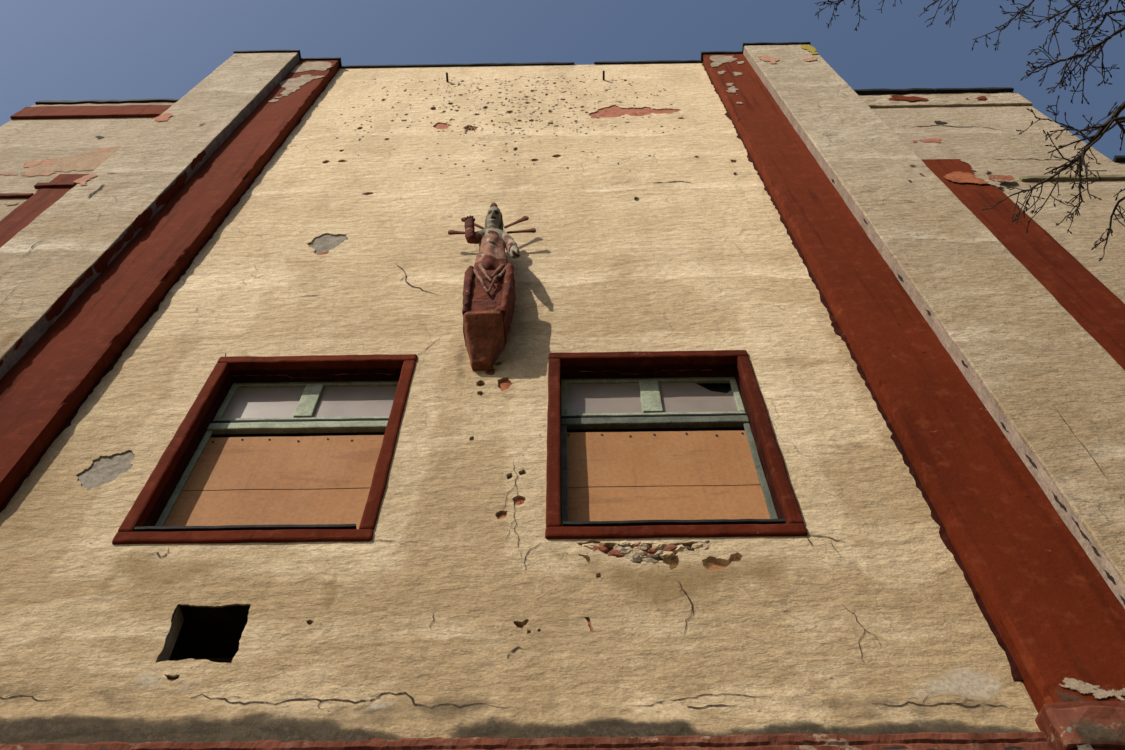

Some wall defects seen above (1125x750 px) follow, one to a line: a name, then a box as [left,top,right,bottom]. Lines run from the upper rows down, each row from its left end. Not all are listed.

peeling [268,61,332,102]
flaking render [340,75,683,176]
flaking render [308,234,348,255]
crack [396,264,435,294]
flaking render [77,451,134,490]
crack [503,460,547,572]
flaking render [582,540,741,570]
crack [676,580,694,633]
crack [192,692,519,709]
crack [633,693,769,708]
crack [874,697,1033,711]
peeling [1059,677,1125,700]